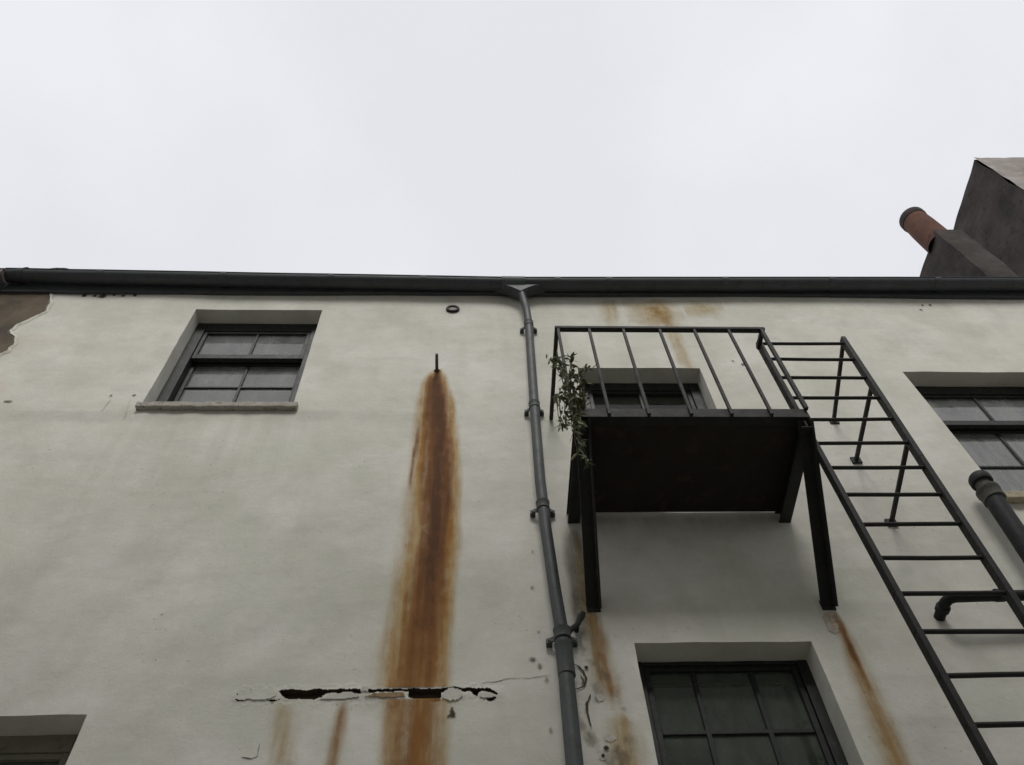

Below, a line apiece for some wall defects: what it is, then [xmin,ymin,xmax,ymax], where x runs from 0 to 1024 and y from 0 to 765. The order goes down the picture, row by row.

flaking render [0,293,54,357]
rust [384,369,458,765]
crack [226,675,548,709]
rust [590,615,614,696]
rust [835,617,904,765]